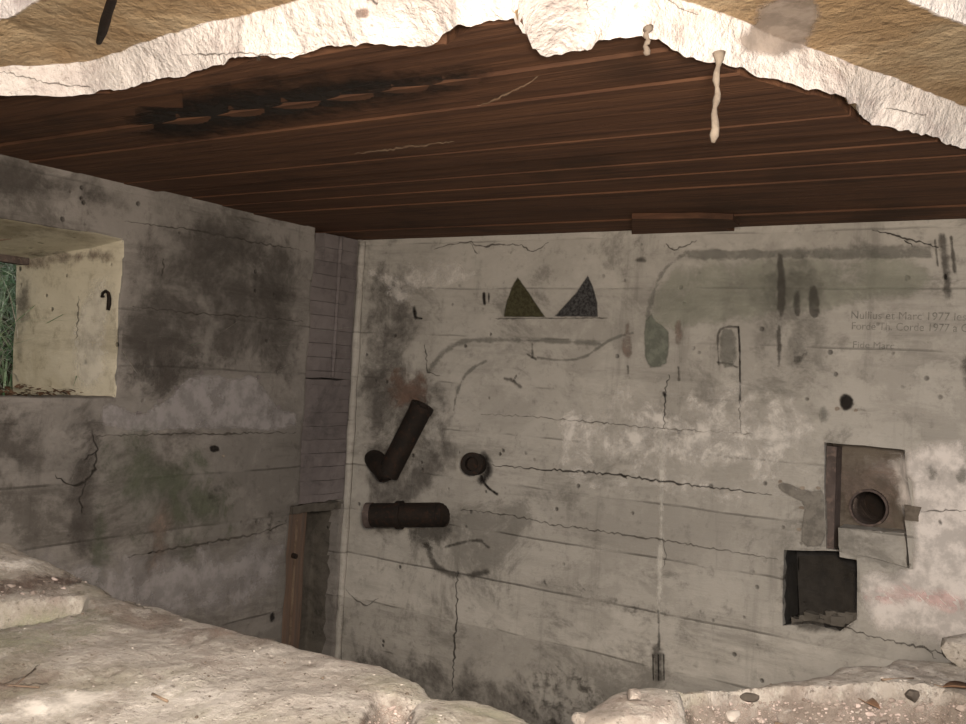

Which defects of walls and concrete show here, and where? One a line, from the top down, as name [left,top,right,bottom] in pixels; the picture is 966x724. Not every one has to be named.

spalling [741,0,817,55]
water stain [75,548,280,611]
crack [451,573,459,693]